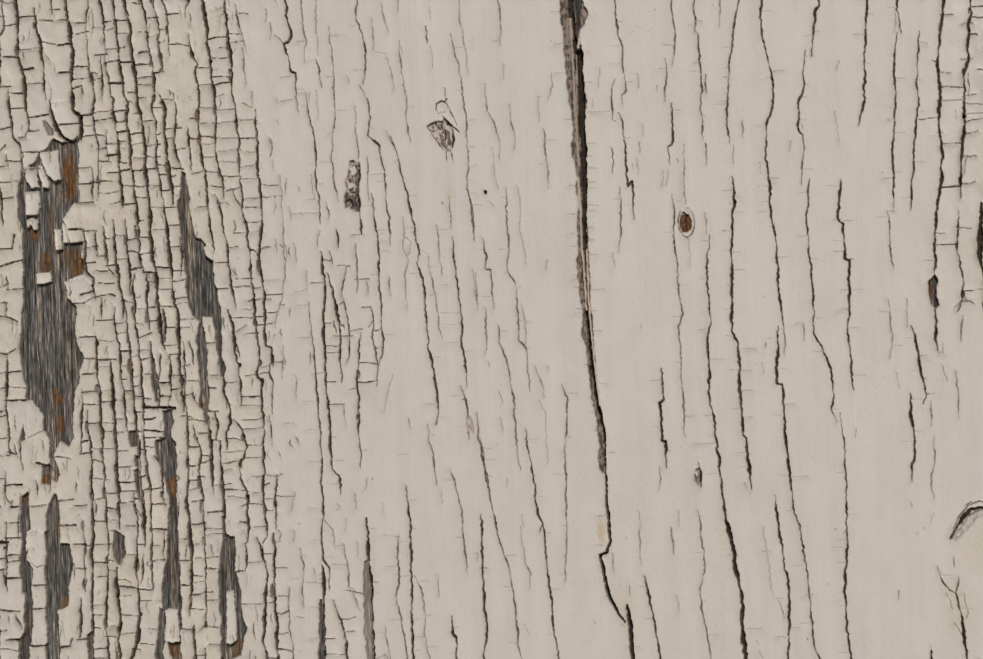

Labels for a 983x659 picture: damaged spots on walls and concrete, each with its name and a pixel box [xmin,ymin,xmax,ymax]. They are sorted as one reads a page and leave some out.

peeling [16,99,95,659]
peeling [177,171,226,425]
crack [0,0,578,659]
crack [586,0,983,659]